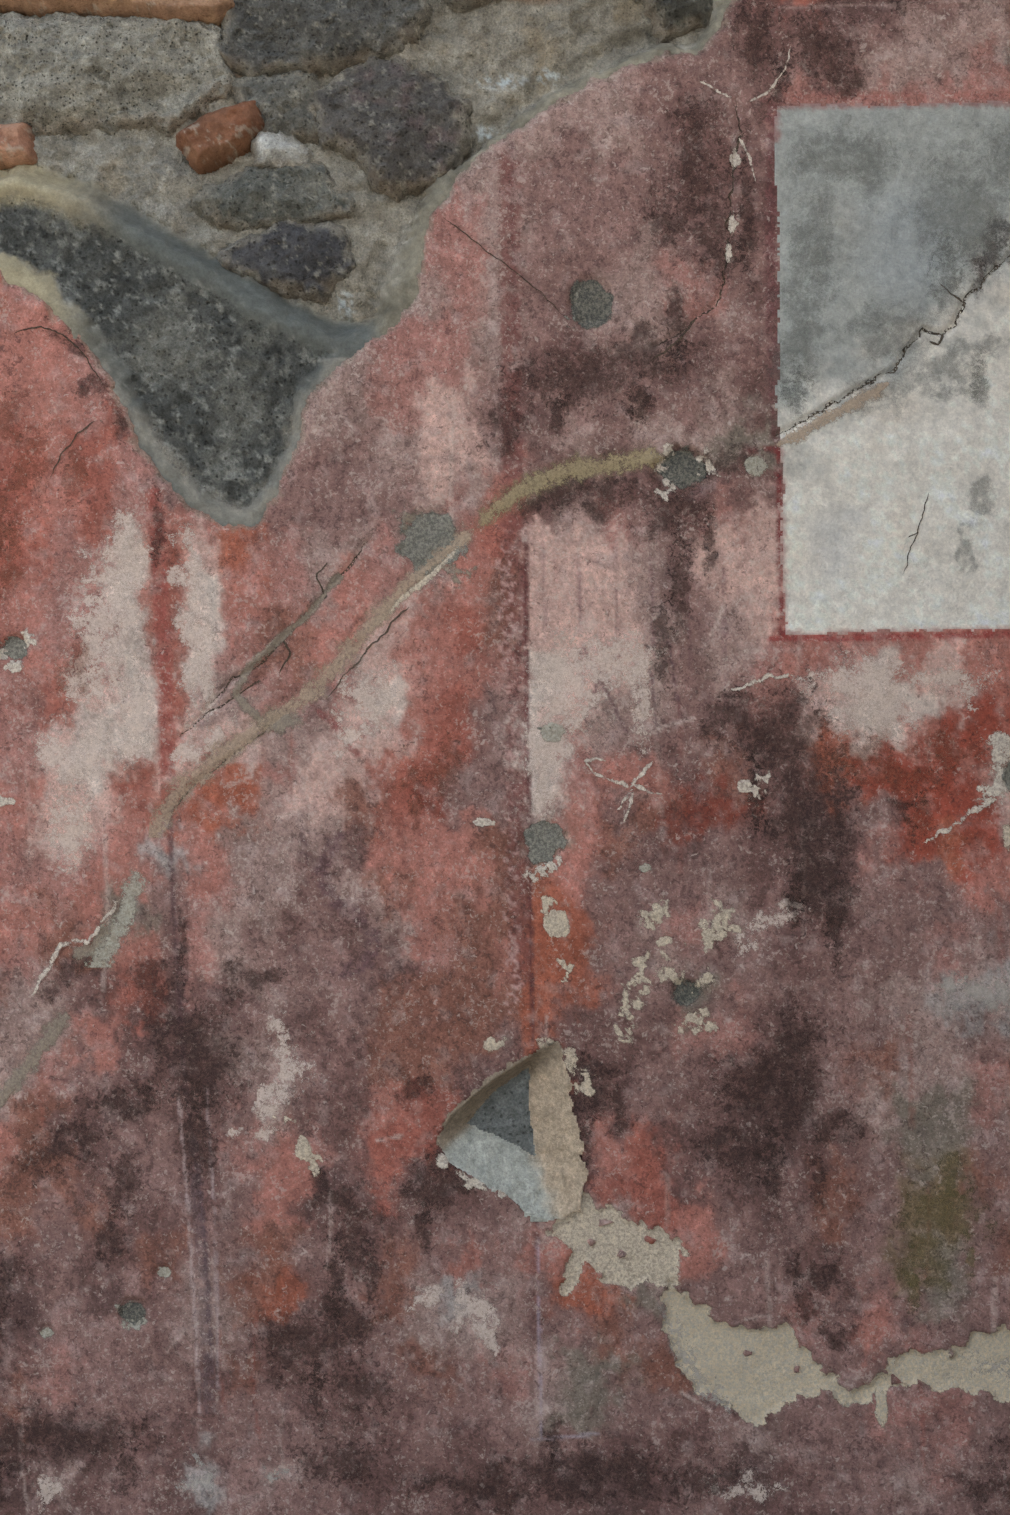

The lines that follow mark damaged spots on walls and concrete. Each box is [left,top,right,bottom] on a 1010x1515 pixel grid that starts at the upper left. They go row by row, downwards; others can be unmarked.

crack [775,256,1010,447]
spalling [647,442,721,502]
peeling [744,456,769,477]
crack [149,447,665,838]
damp [517,477,718,821]
damp [701,650,1002,961]
crack [0,1010,70,1108]
crack [84,871,149,968]
damp [573,1056,634,1166]
flaking render [613,896,741,1044]
damp [693,1007,864,1207]
flaking render [436,1037,1010,1428]